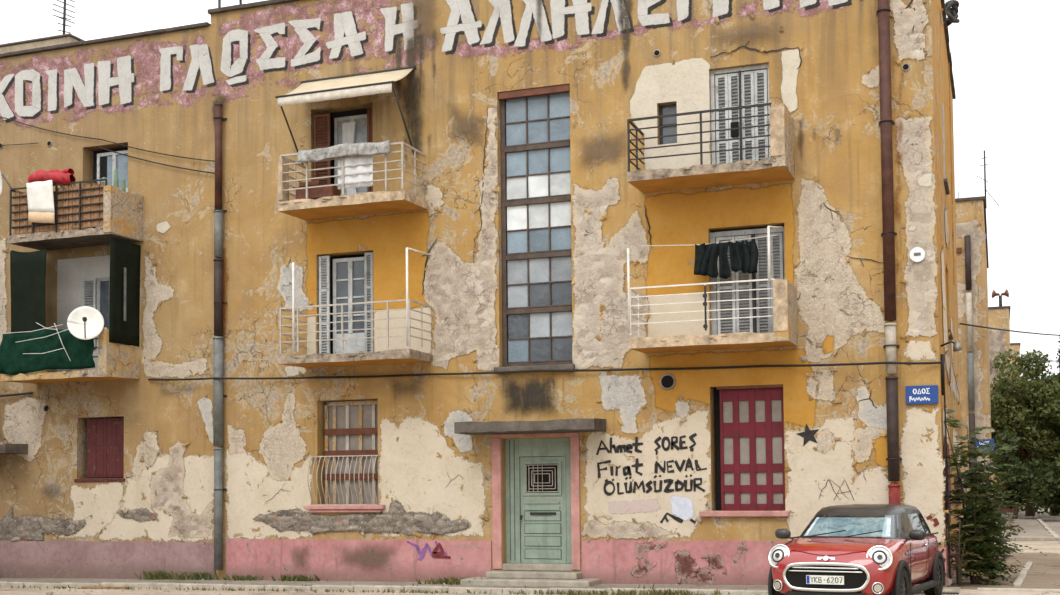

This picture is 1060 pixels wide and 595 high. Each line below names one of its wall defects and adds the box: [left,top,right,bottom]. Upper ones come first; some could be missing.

flaking render [889,0,943,71]
flaking render [0,237,8,344]
flaking render [141,256,209,379]
flaking render [285,366,307,377]
flaking render [423,106,500,372]
leakage [505,379,552,412]
flaking render [571,176,726,585]
peeling [784,114,1008,544]
peeling [0,390,489,543]